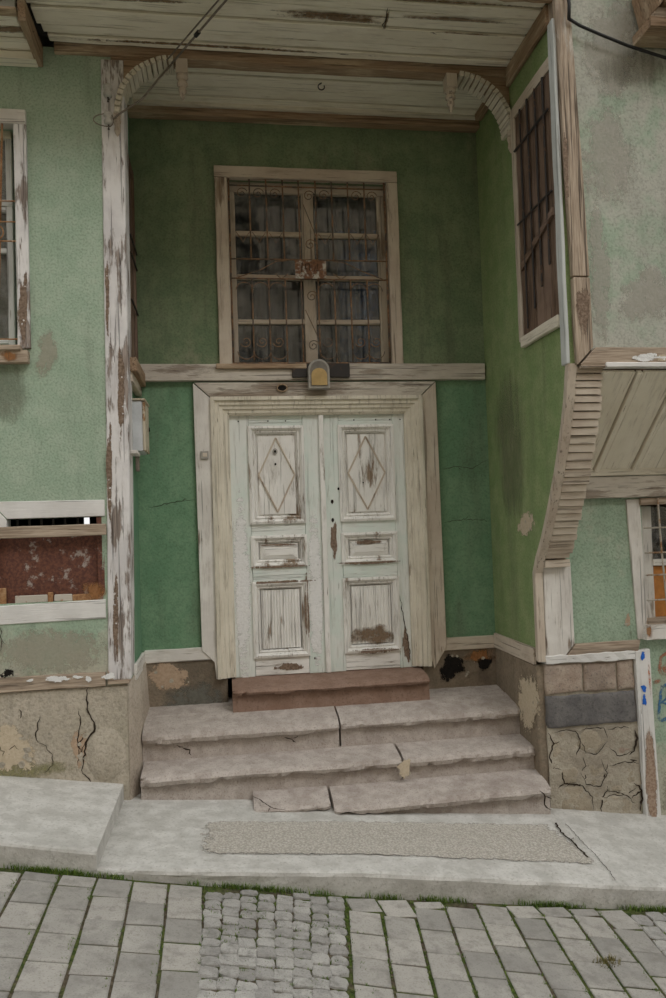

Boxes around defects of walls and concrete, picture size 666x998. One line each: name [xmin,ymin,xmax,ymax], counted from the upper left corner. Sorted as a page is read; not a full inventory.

peeling [576,288,590,334]
peeling [105,261,125,520]
rust [0,517,105,603]
peeling [148,662,189,690]
peeling [351,624,410,664]
spalling [440,654,492,682]
crack [0,710,53,772]
crack [77,688,96,782]